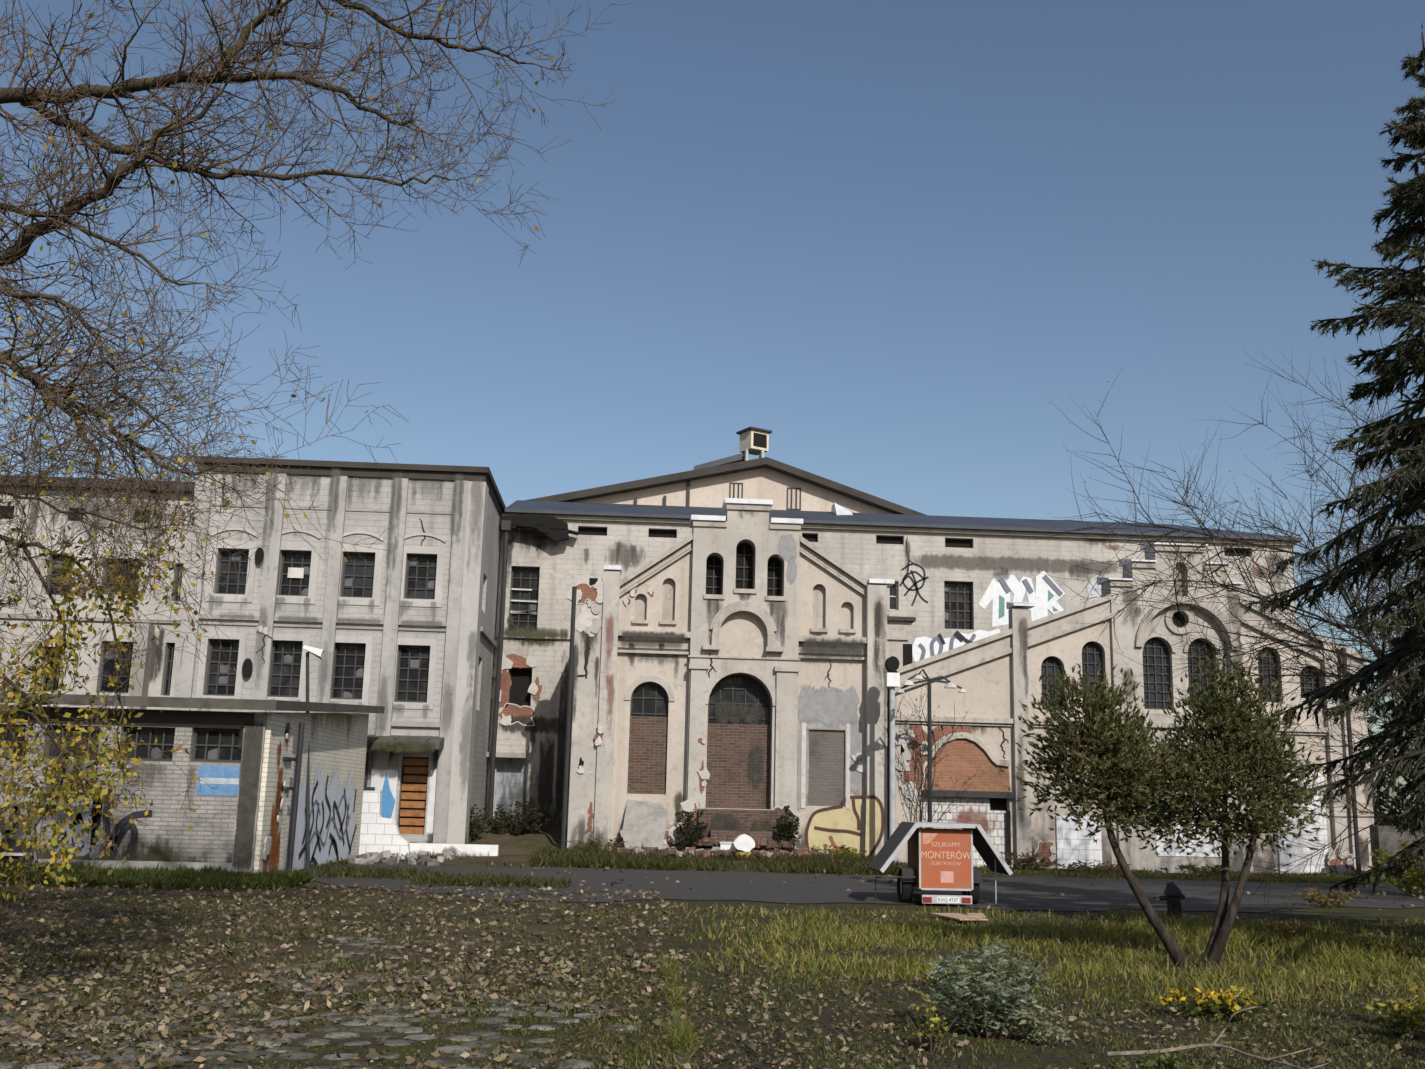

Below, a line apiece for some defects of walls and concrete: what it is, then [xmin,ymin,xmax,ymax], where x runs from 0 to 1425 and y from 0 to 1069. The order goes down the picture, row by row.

peeling [566,580,604,637]
spalling [491,654,542,726]
rust [268,722,290,872]
spalling [895,713,1010,802]